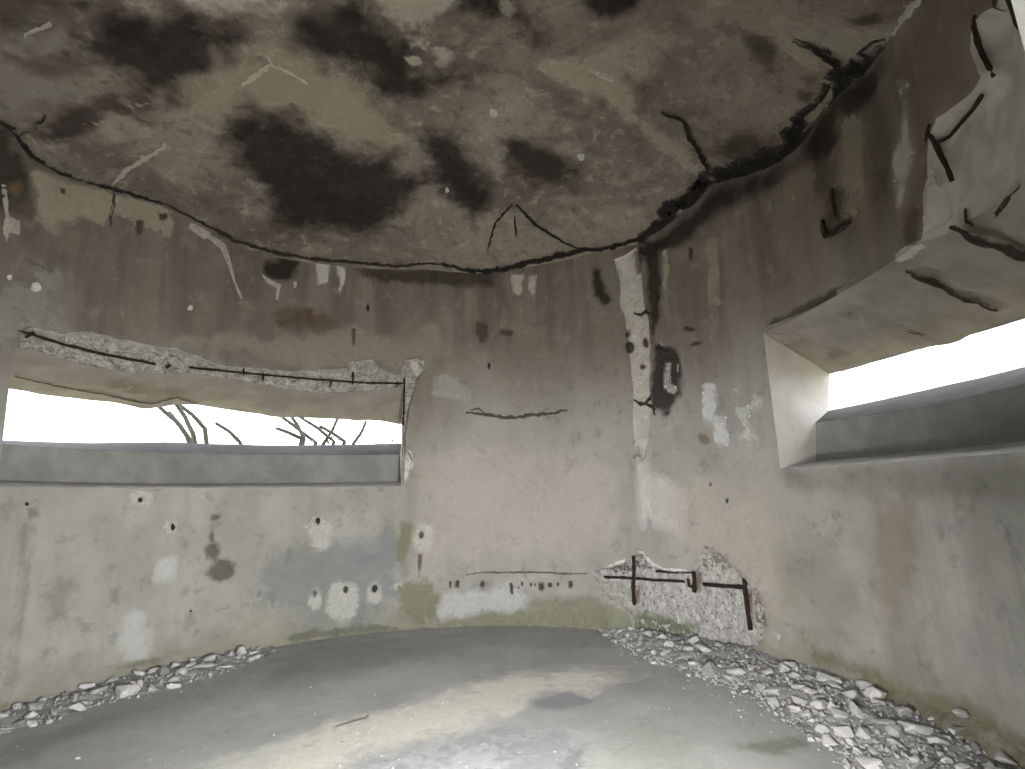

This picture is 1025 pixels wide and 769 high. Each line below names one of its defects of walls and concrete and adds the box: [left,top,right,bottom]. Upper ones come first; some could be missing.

damp [382,0,542,42]
damp [586,0,638,16]
spalling [1005,0,1020,33]
damp [75,0,490,232]
crack [0,37,888,275]
damp [813,105,917,246]
peeling [895,94,1025,312]
spalling [14,329,172,369]
crack [466,407,567,420]
spalling [614,249,663,462]
damp [650,344,681,415]
spalling [592,547,783,650]